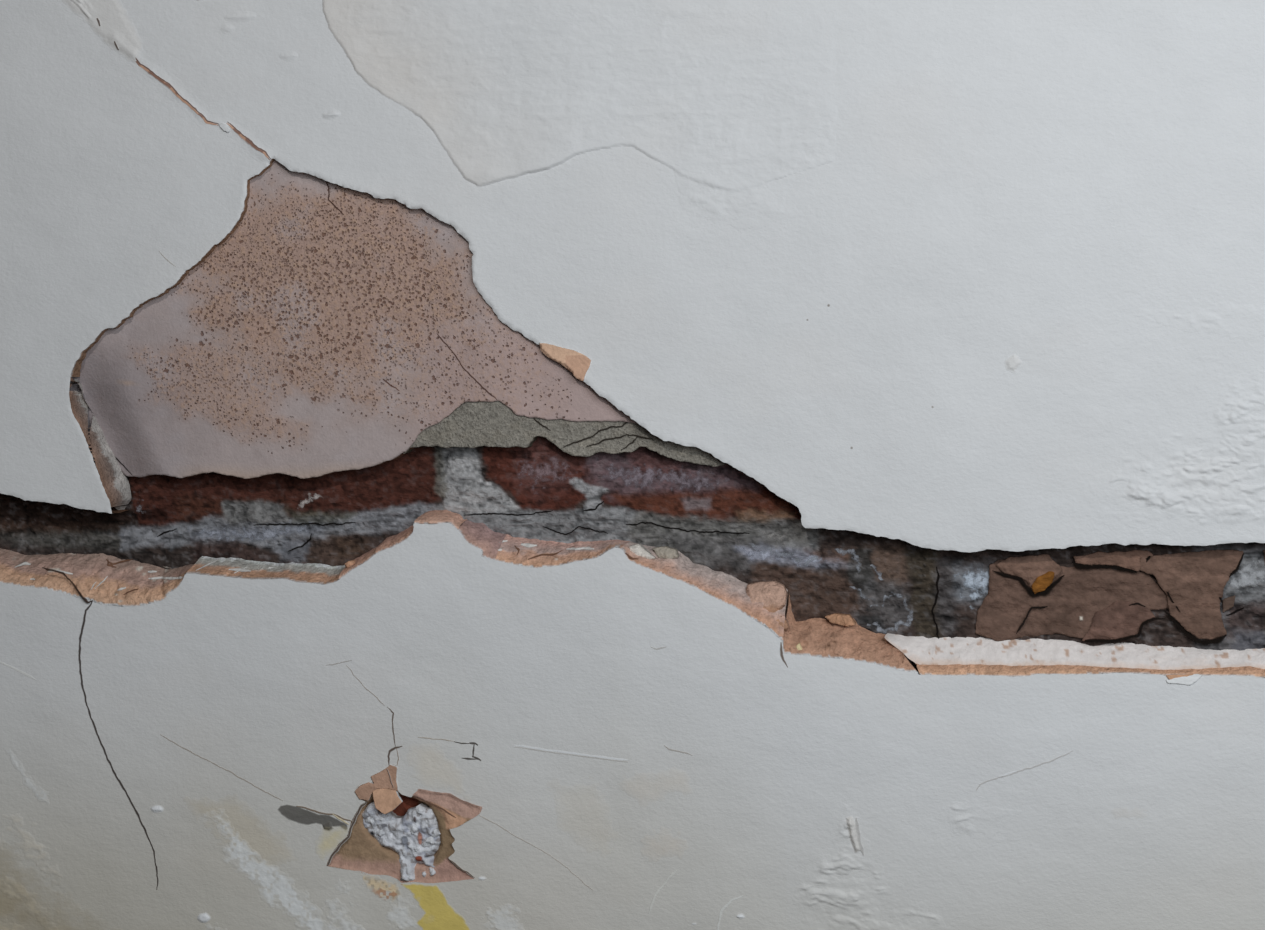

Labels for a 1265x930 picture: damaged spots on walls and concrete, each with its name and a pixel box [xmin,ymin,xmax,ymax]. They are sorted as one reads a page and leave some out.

flaking render [69,159,727,510]
flaking render [328,784,482,885]
crack [0,436,1265,890]